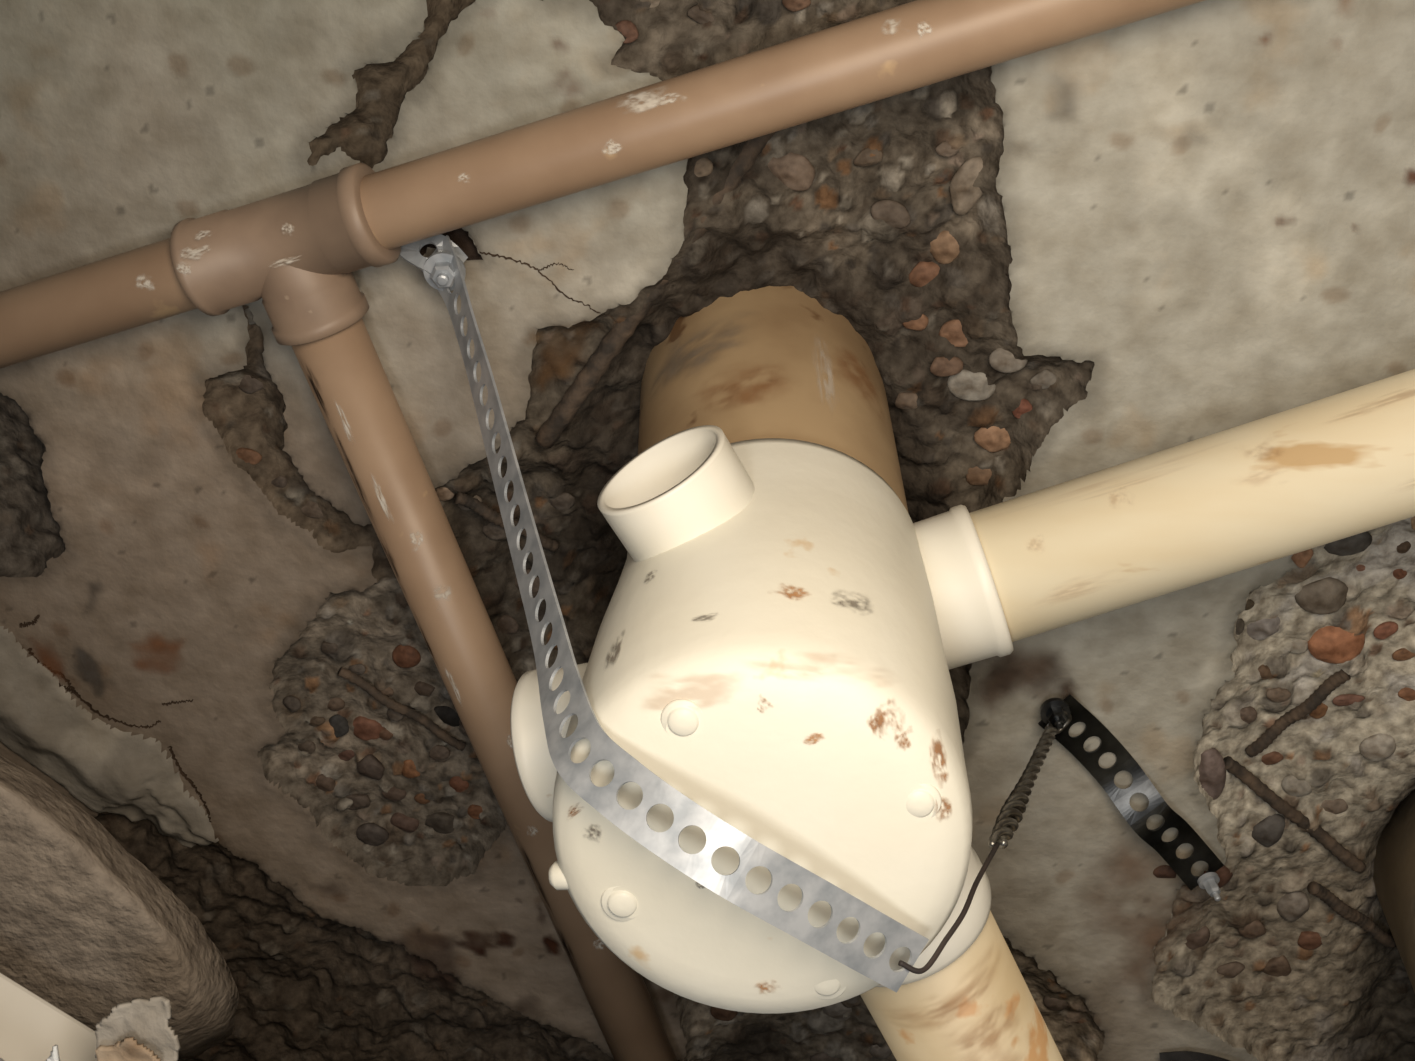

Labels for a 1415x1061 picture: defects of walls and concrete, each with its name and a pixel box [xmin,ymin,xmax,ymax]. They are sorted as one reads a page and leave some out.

spalling [307,0,476,168]
spalling [589,0,915,81]
spalling [420,228,483,260]
spalling [435,66,1095,683]
spalling [0,393,66,578]
spalling [202,305,507,886]
spalling [949,663,972,744]
spalling [1150,516,1415,1061]
peeling [46,1045,60,1061]
spalling [94,811,614,1061]
spalling [671,992,897,1061]
spalling [1003,936,1105,1061]